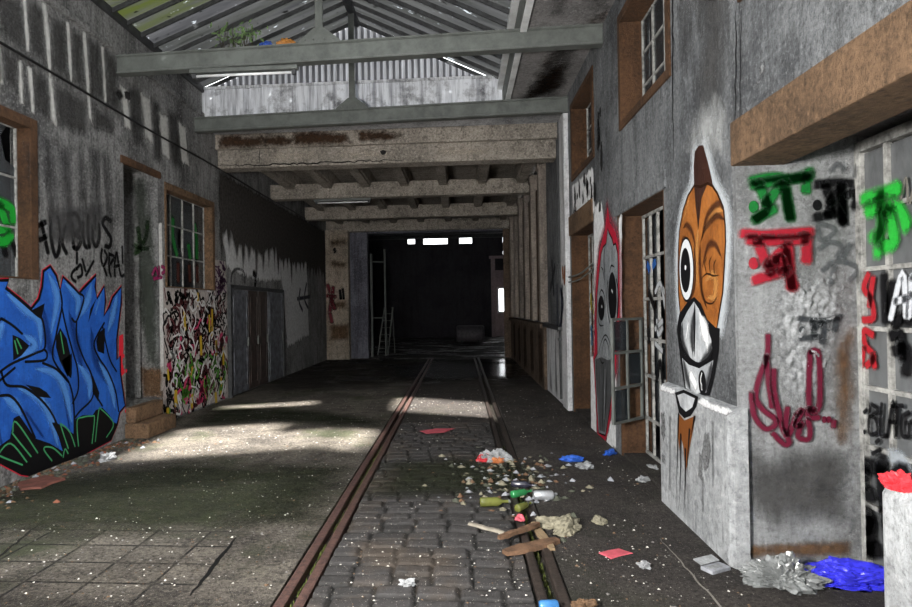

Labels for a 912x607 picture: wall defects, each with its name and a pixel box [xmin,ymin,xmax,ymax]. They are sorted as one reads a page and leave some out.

water stain [0,0,189,166]
water stain [530,50,572,95]
crack [734,6,742,110]
crack [0,520,44,556]